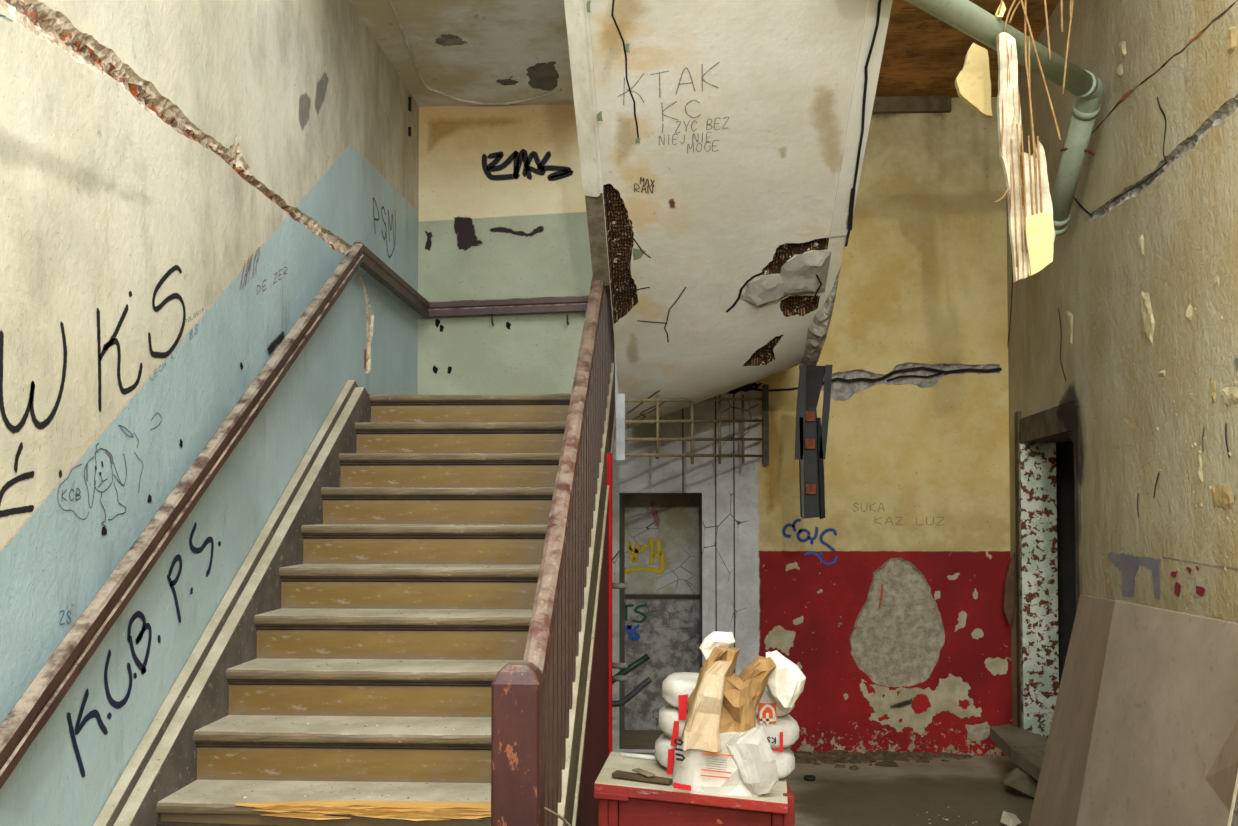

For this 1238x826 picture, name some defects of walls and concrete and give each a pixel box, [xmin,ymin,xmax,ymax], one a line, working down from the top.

crack [611,0,639,138]
crack [1074,0,1238,217]
flaking render [603,184,638,324]
flaking render [743,335,783,366]
flaking render [762,238,829,275]
flaking render [780,215,848,366]
crack [755,235,1013,401]
crack [1058,308,1066,381]
peeling [1179,352,1238,524]
peeling [764,616,804,670]
flaking render [843,557,990,742]
peeling [984,657,1008,676]